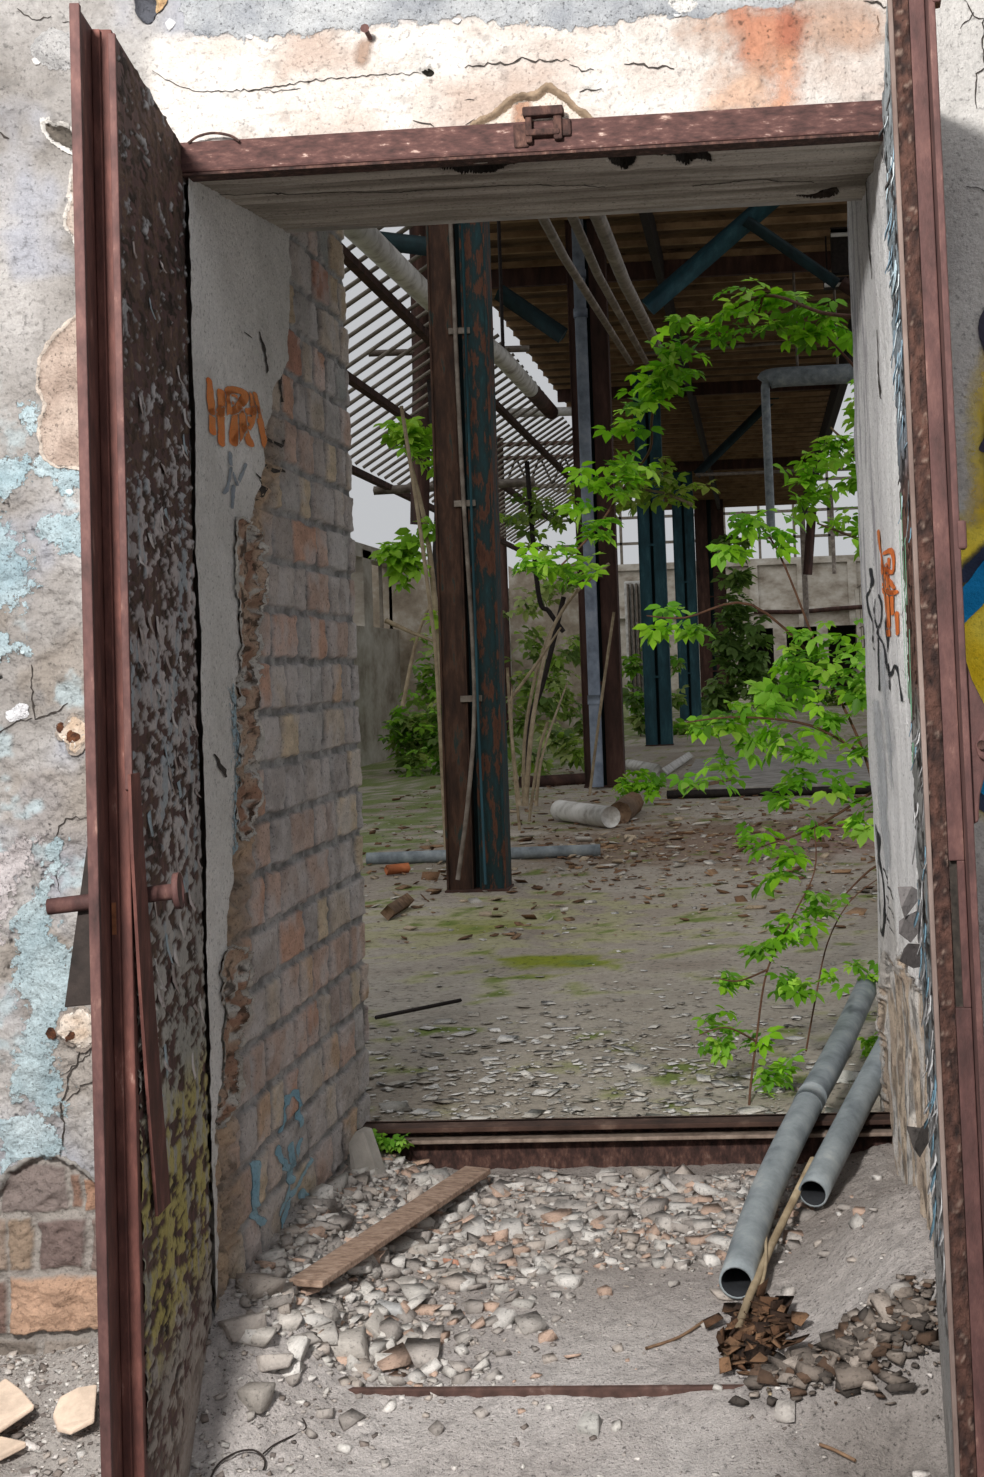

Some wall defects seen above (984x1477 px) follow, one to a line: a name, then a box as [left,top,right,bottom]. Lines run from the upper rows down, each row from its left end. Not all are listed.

crack [152,70,421,93]
peeling [134,0,802,44]
corrosion [693,8,872,110]
crack [960,0,984,108]
spalling [40,116,74,243]
spalling [0,314,81,615]
peeling [0,632,33,679]
peeling [6,703,29,722]
spalling [55,712,85,756]
spalling [228,516,270,855]
spalling [0,832,98,1356]
crack [59,1049,92,1155]